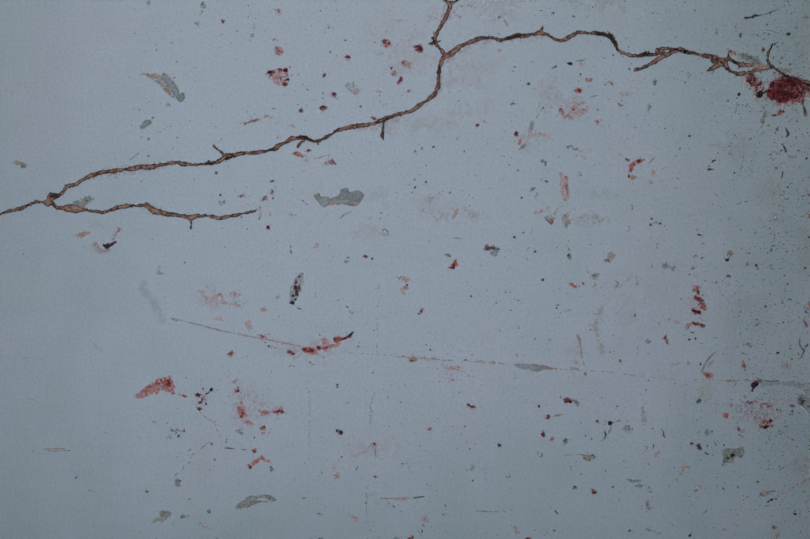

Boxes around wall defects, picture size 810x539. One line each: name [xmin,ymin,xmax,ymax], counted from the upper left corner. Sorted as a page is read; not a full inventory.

peeling [143,71,185,106]
crack [0,0,810,229]
rust [744,73,810,122]
peeling [314,188,364,217]